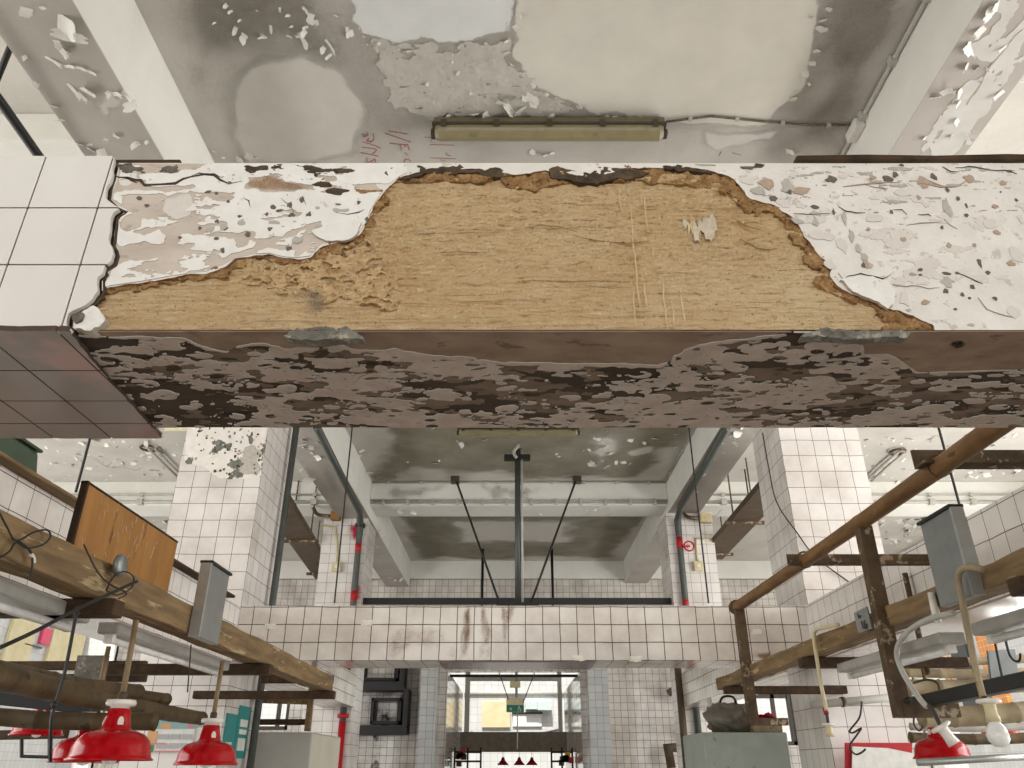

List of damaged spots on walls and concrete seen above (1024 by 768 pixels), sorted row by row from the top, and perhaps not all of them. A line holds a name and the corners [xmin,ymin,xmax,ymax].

peeling [18,6,97,76]
leakage [161,0,921,163]
crack [72,168,250,327]
flaking render [44,0,1024,485]